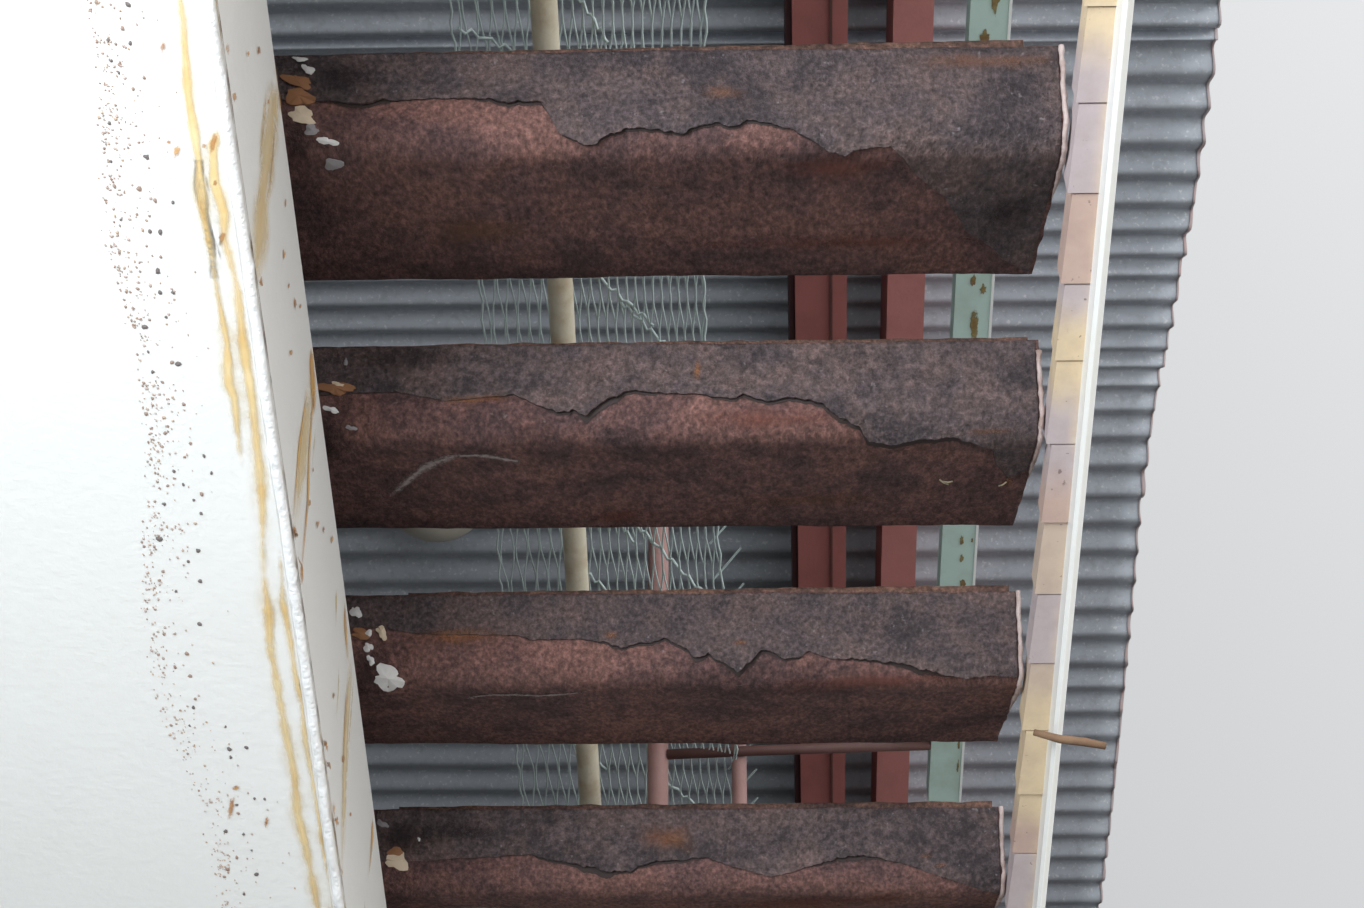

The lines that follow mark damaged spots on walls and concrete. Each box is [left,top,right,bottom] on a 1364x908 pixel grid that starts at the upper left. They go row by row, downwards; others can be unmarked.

rust [167,0,232,267]
rust [256,92,281,262]
peeling [280,57,344,170]
water stain [87,0,269,908]
rust [214,274,265,526]
rust [295,353,333,544]
rust [970,312,978,338]
peeling [349,607,405,692]
rust [264,587,329,908]
rust [333,683,352,819]
peeling [385,847,408,871]